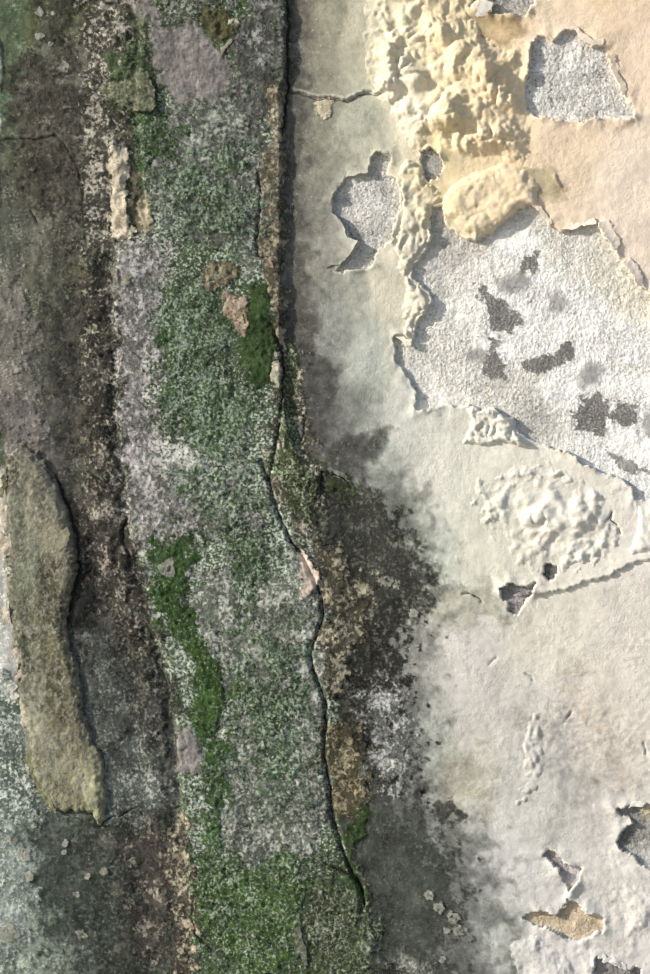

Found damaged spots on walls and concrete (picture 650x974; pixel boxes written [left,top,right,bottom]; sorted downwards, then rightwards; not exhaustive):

crack [281,0,378,135]
peeling [525,26,634,123]
crack [255,172,270,258]
peeling [318,153,401,273]
peeling [394,203,650,501]
crack [262,330,306,553]
crack [320,471,351,490]
water stain [272,22,516,974]
peeling [500,563,557,614]
crack [311,585,365,911]
peeling [617,801,650,868]
peeling [523,850,603,940]